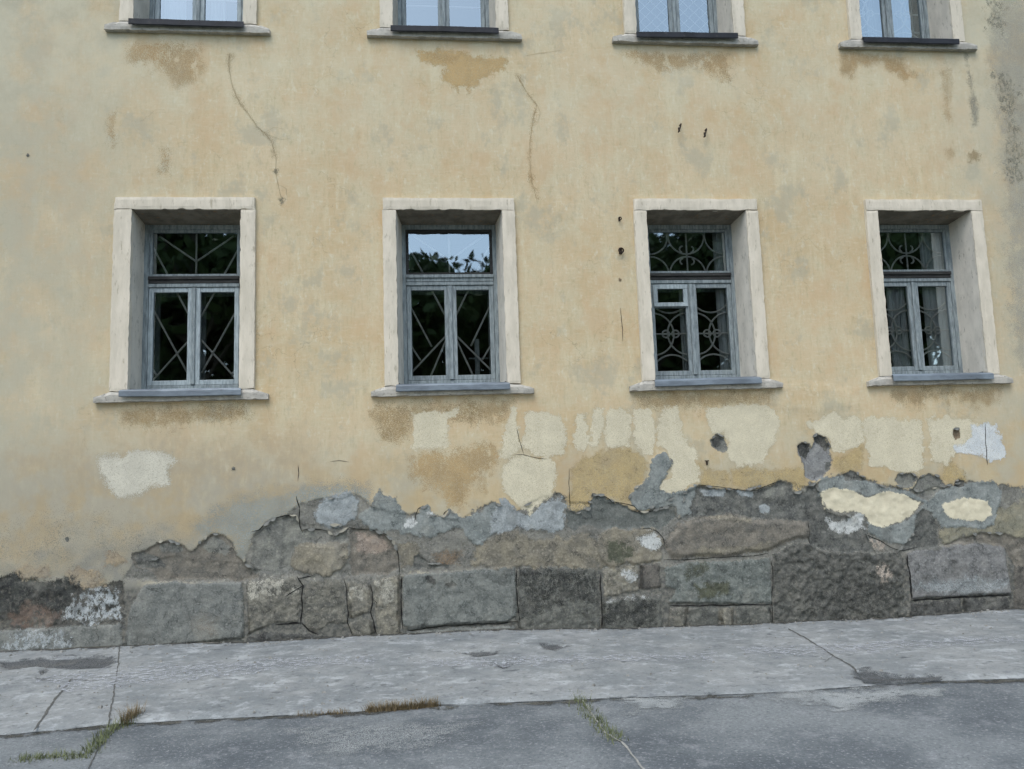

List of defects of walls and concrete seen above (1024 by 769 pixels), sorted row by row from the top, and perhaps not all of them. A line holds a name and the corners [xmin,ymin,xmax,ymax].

crack [225,53,290,204]
crack [515,50,560,200]
leakage [838,50,917,84]
leakage [939,0,1024,366]
leakage [0,474,374,651]
flaking render [0,433,1024,632]